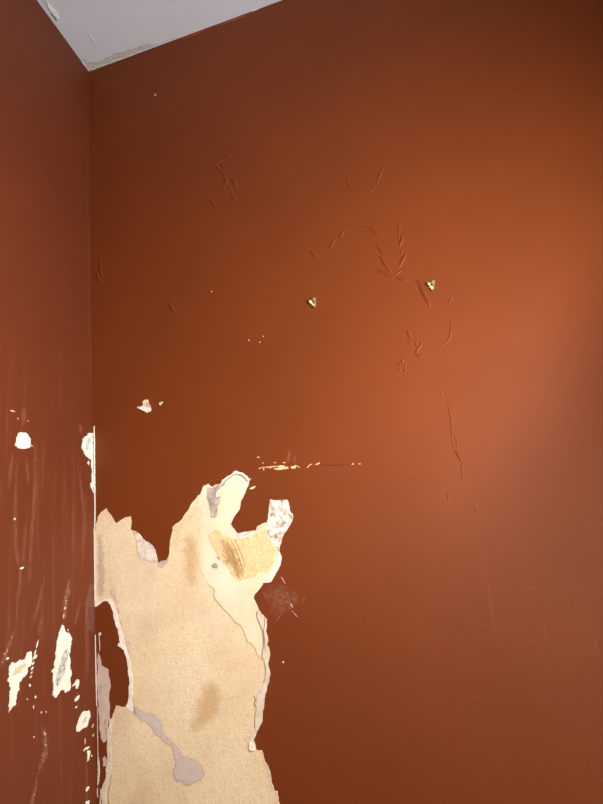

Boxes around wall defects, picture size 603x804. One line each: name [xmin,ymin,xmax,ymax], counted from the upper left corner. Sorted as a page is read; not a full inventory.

peeling [137,400,163,413]
peeling [15,432,32,449]
peeling [81,433,94,493]
peeling [51,471,293,804]
peeling [6,640,47,714]